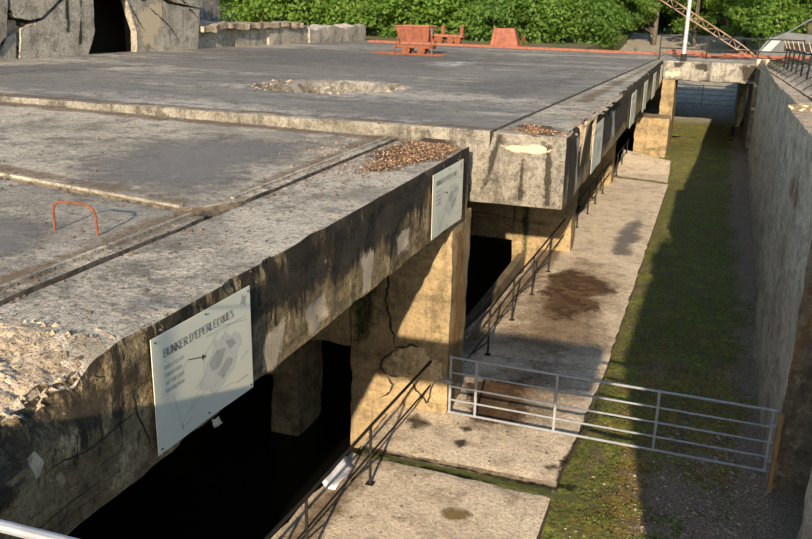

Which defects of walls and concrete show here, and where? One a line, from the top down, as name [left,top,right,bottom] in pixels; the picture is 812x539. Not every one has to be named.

crack [1,0,61,54]
crack [129,0,199,46]
leakage [0,199,198,285]
leakage [517,159,530,254]
leakage [543,145,552,206]
spalling [0,318,69,412]
crack [38,389,154,480]
crack [380,276,439,403]
spalling [382,346,443,384]
leakage [489,367,561,419]
leakage [463,250,619,349]